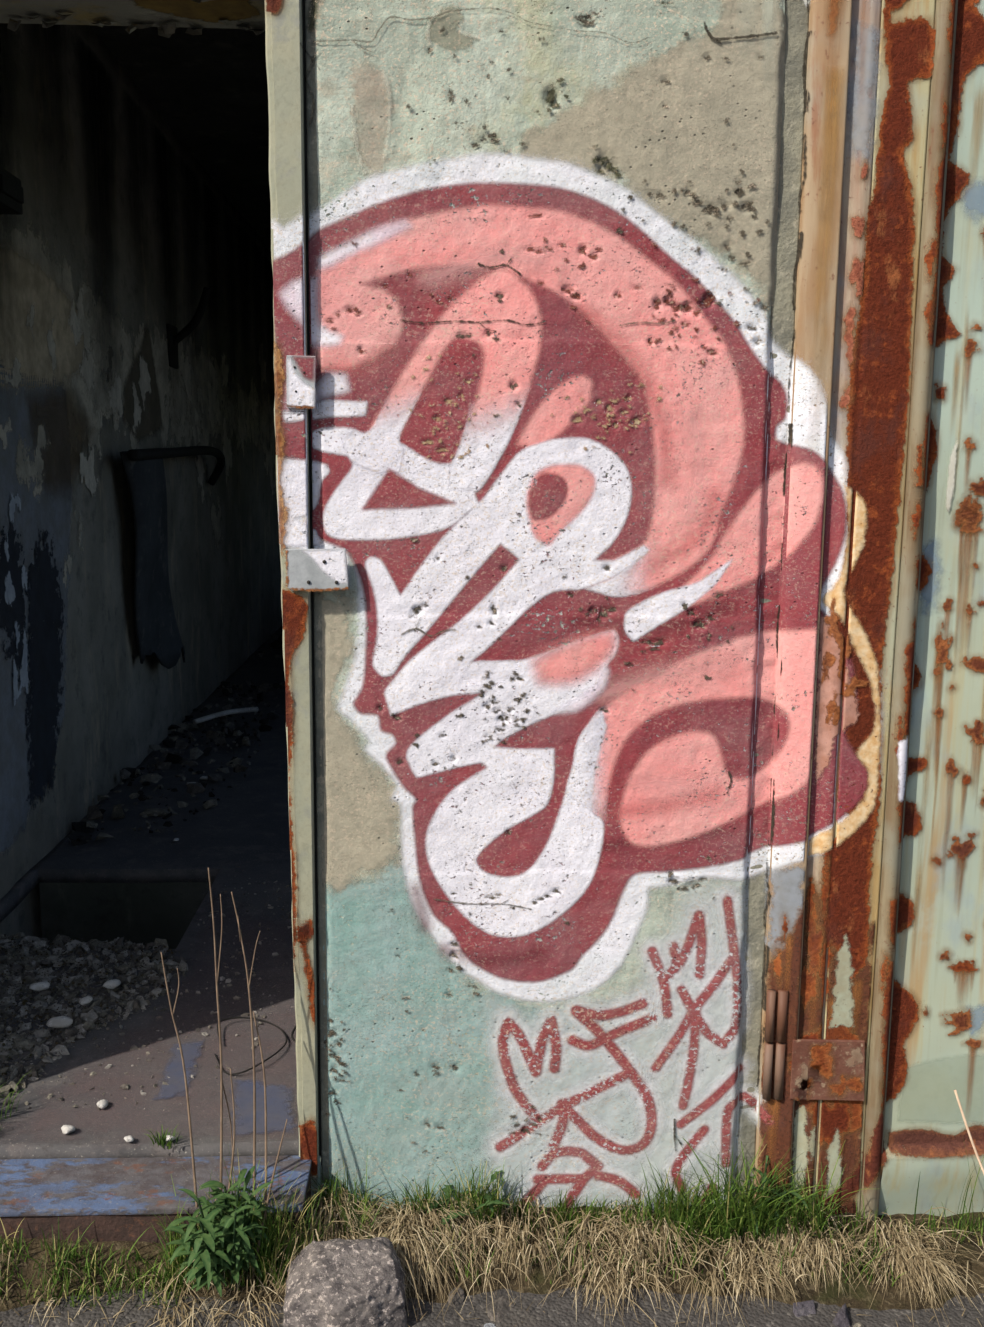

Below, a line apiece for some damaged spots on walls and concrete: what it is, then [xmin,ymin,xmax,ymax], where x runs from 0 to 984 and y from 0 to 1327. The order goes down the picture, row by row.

rust [265,0,282,13]
spalling [802,31,811,114]
peeling [472,0,786,366]
spalling [798,135,806,212]
spalling [792,232,803,310]
spalling [783,423,793,495]
rust [756,0,984,1215]
rust [274,341,348,1025]
rust [298,1120,318,1176]